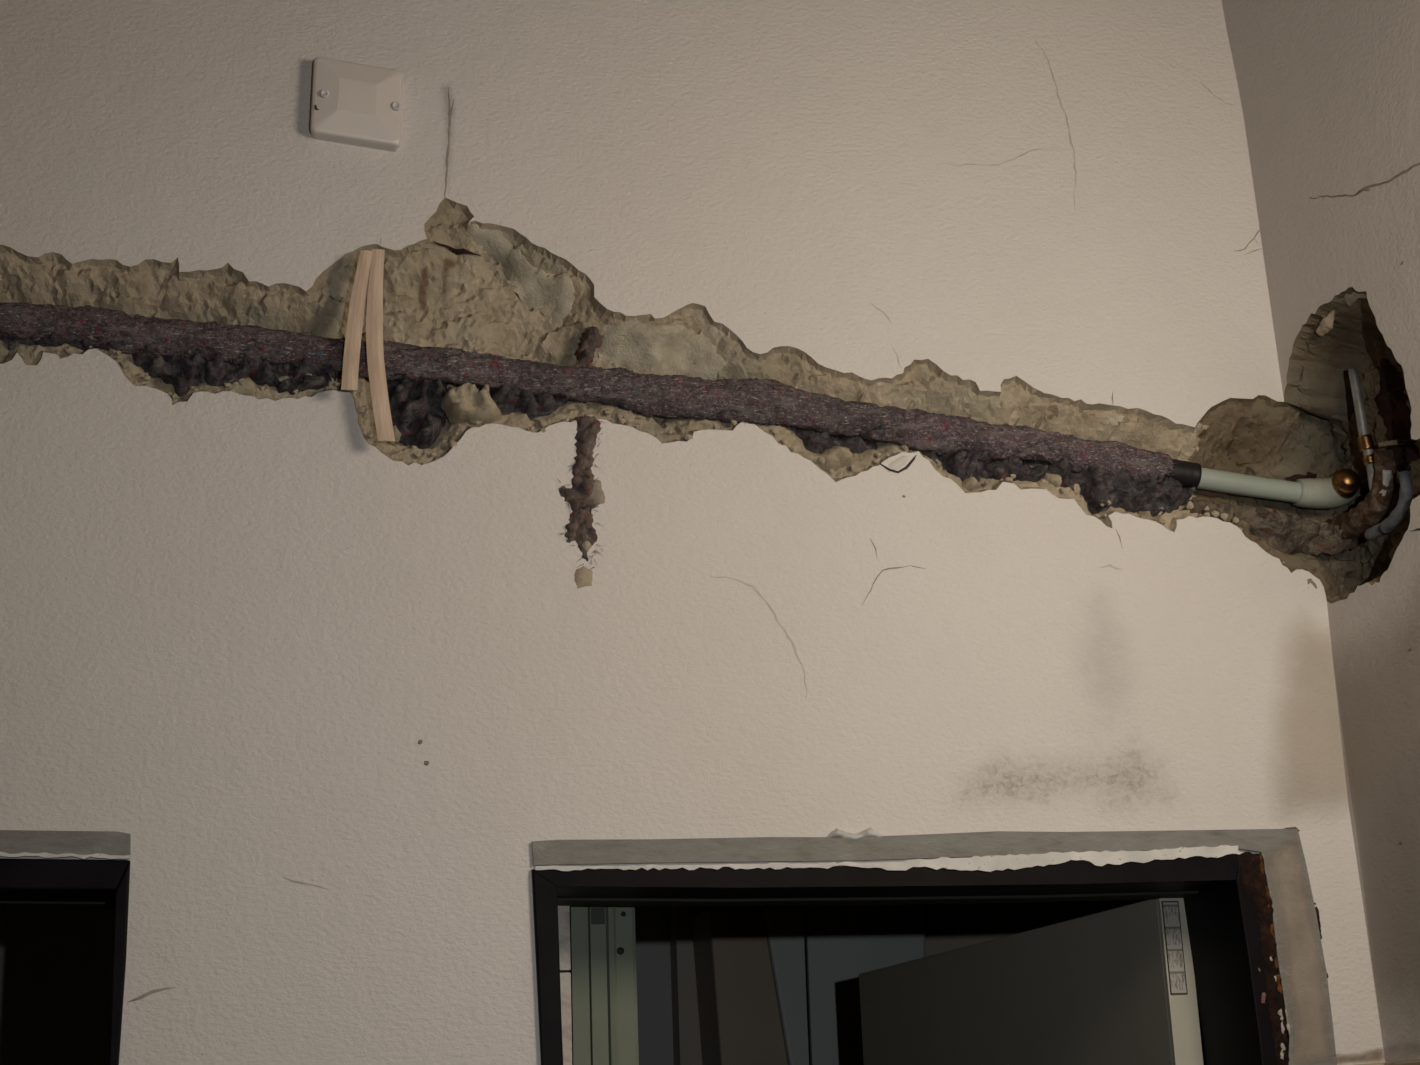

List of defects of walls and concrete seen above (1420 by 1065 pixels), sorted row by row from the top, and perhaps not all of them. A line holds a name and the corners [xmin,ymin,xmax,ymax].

crack [1310,163,1420,199]
flaking render [0,198,1420,604]
crack [862,539,925,605]
crack [711,576,807,698]
corrosion [1237,852,1290,1065]